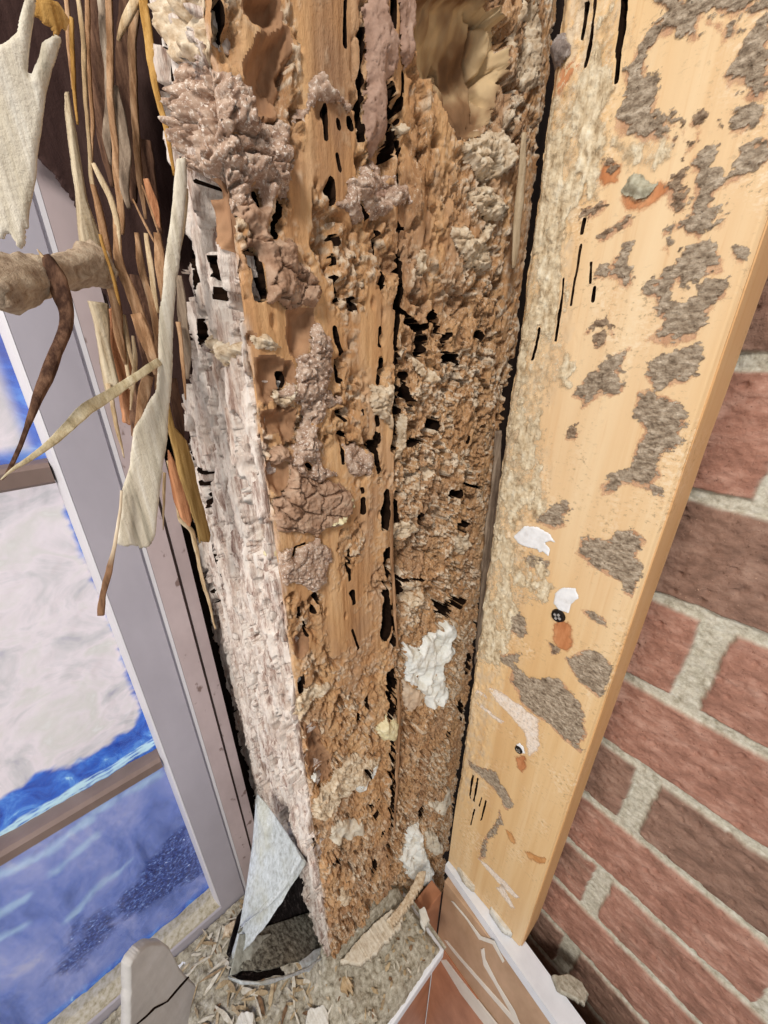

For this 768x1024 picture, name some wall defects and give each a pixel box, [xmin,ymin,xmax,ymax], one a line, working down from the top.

crack [581,0,628,84]
damp [624,0,766,86]
damp [724,26,768,101]
damp [663,164,743,238]
crack [531,217,596,361]
rust [553,622,573,650]
crack [469,775,487,825]